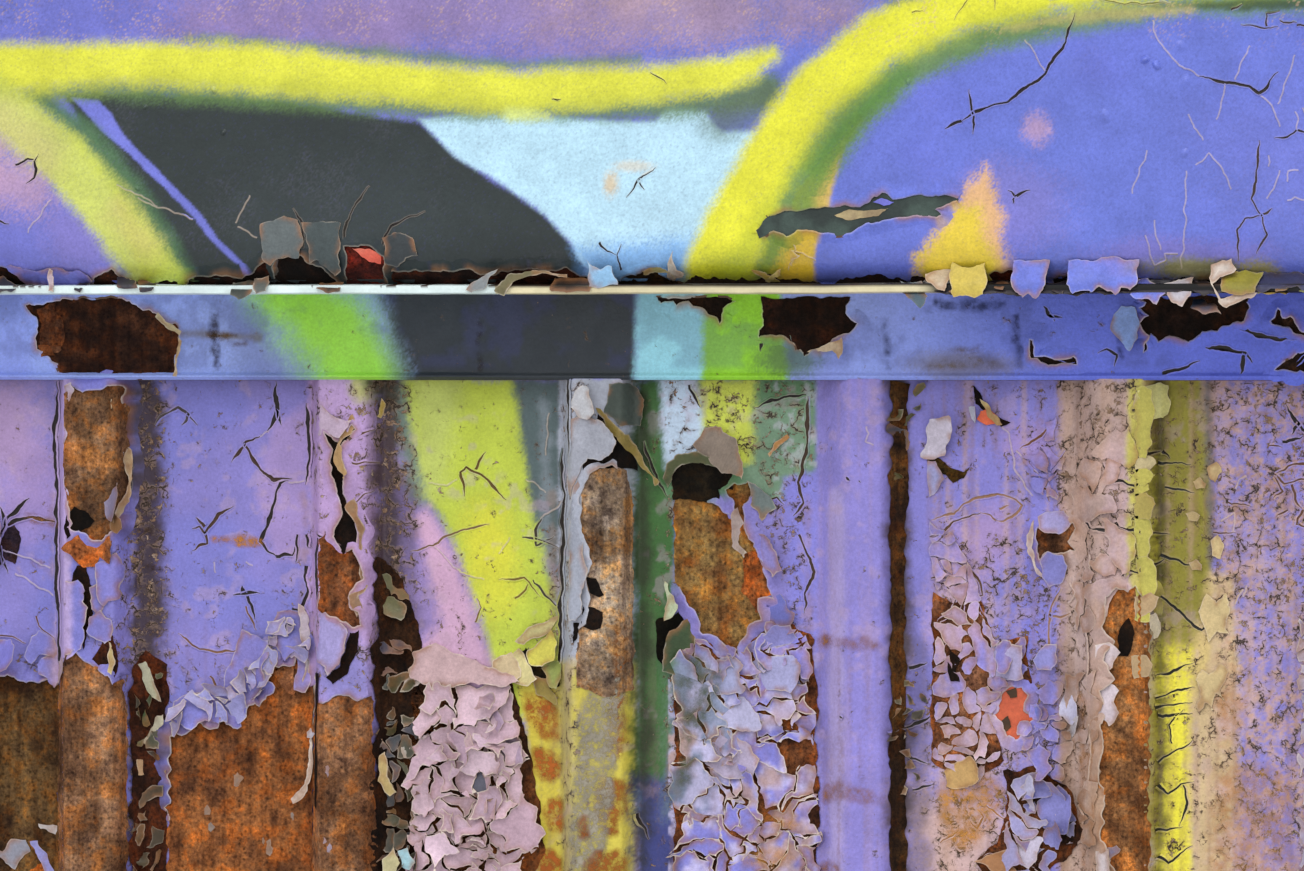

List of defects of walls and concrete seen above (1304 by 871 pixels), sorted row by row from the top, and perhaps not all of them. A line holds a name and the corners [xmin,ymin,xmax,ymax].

crack [896,0,923,15]
crack [0,153,52,233]
crack [945,0,1304,269]
peeling [177,181,963,366]
peeling [900,256,1304,386]
crack [154,404,199,426]
crack [177,381,322,686]
peeling [0,257,823,871]
peeling [886,381,1171,871]
peeling [1296,617,1304,777]
corrosion [587,851,627,871]
corrosion [603,780,627,835]